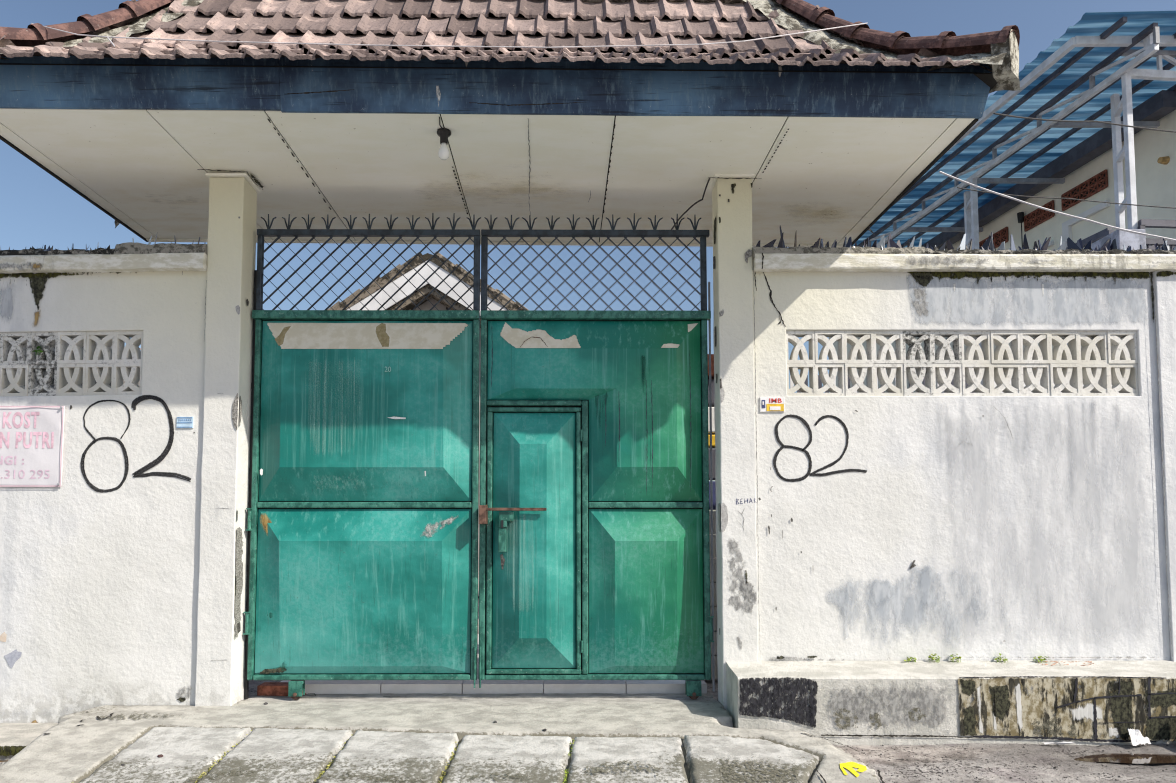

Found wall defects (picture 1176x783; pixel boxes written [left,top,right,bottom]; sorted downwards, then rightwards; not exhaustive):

water stain [0,262,47,325]
water stain [907,256,1146,325]
crack [738,253,786,640]
water stain [828,567,960,637]
water stain [829,678,1176,740]